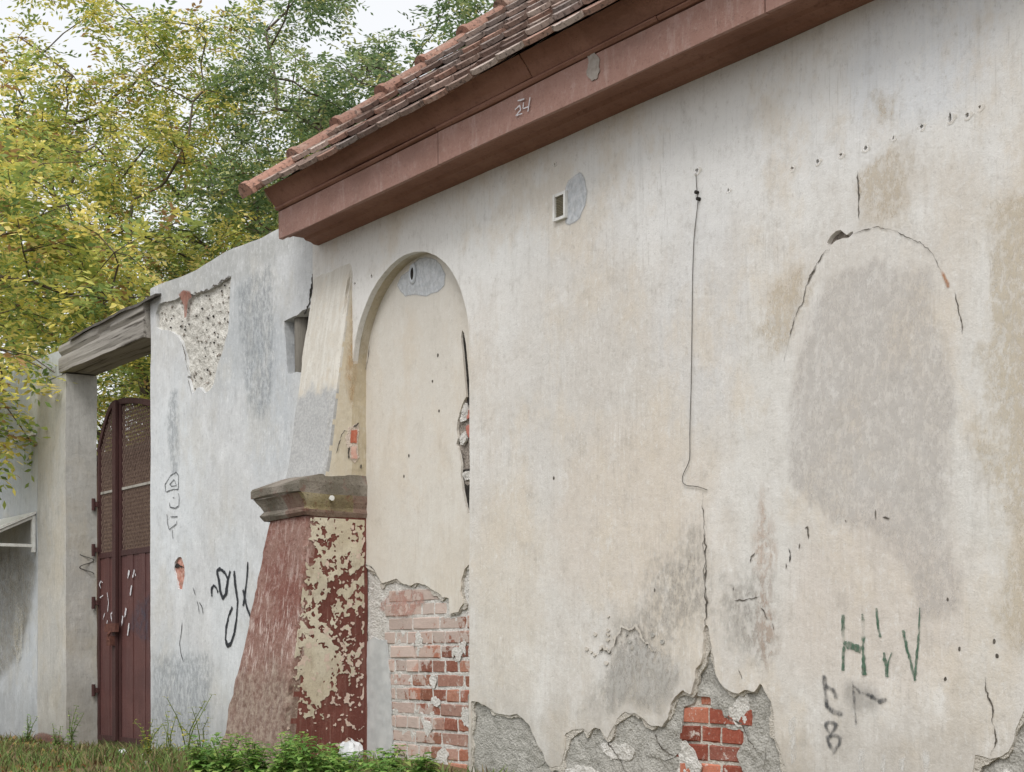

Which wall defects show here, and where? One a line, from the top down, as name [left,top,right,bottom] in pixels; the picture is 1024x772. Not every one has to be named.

crack [853,174,941,270]
flaking render [159,278,231,392]
crack [784,250,826,359]
flaking render [336,422,362,468]
flaking render [459,401,470,508]
flaking render [175,557,185,589]
crack [701,508,709,621]
flaking render [293,517,786,772]